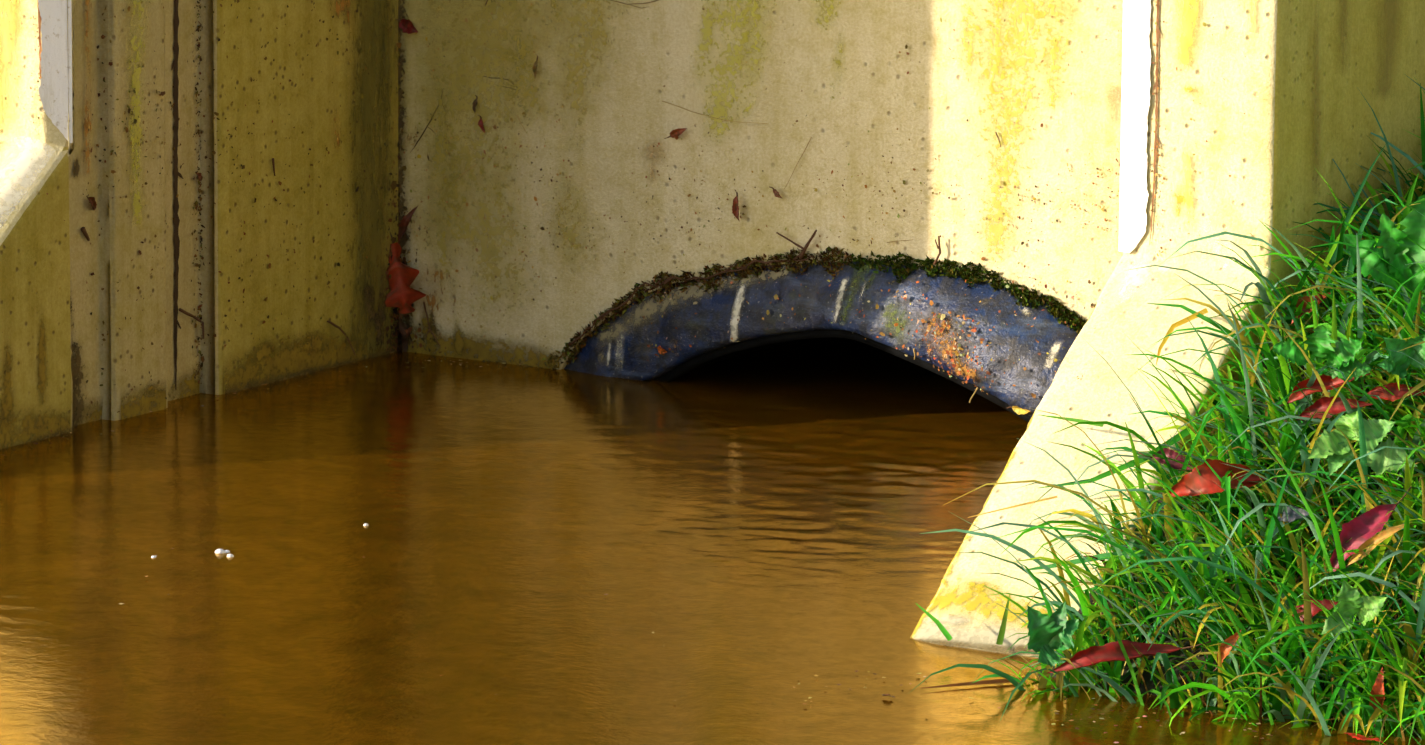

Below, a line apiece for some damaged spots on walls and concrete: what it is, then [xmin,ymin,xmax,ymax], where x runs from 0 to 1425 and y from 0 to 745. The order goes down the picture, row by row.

damp [962,0,1012,131]
damp [1039,0,1071,109]
damp [0,345,14,419]
damp [37,319,47,404]